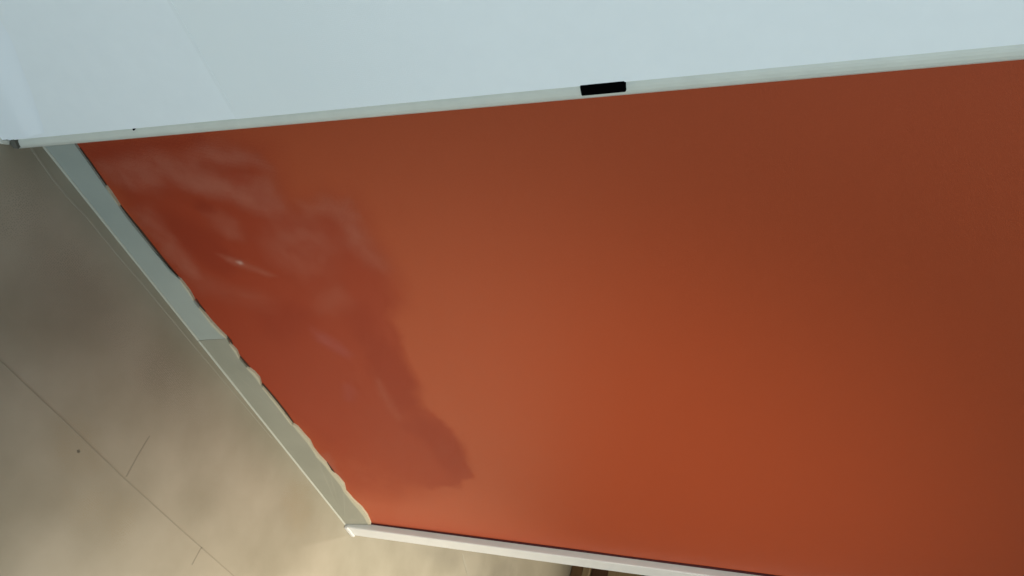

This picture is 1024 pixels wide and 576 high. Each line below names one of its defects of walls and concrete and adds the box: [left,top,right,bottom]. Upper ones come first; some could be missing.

leakage [77,0,486,506]